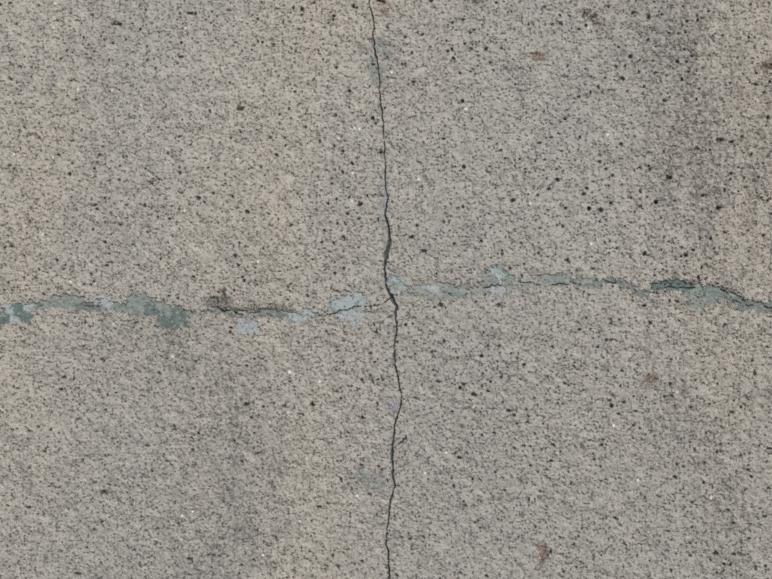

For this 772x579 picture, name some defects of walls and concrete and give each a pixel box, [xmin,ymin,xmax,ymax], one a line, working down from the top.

peeling [0,290,190,333]
peeling [233,305,316,334]
peeling [326,289,368,326]
peeling [382,263,515,299]
crack [158,0,772,579]
peeling [537,270,606,289]
peeling [652,280,772,314]